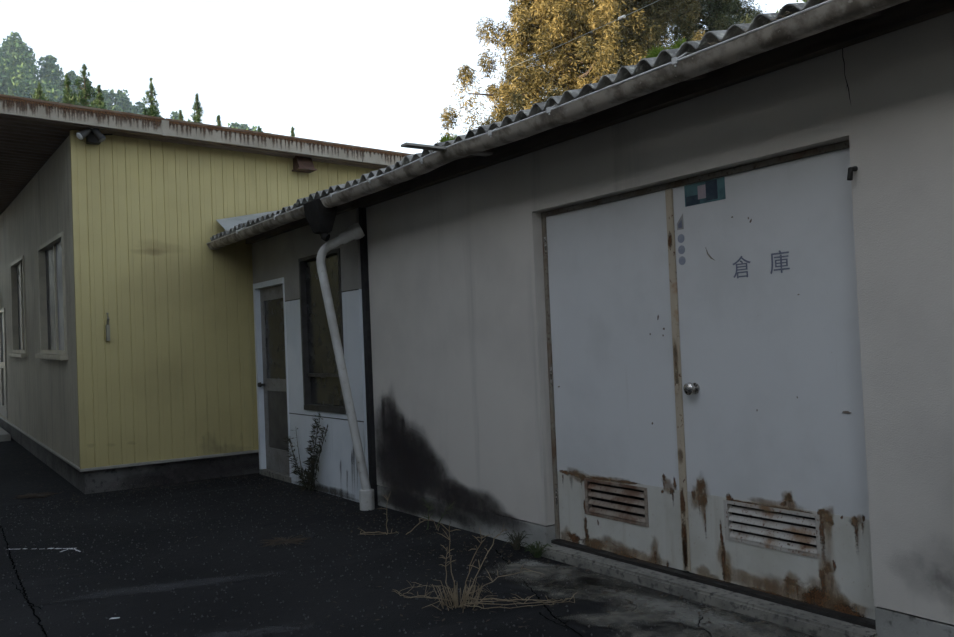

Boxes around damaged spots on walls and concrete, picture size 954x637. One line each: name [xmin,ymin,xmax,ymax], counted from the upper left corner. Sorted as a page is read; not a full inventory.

corrosion [0,96,407,162]
damp [376,401,517,527]
corrosion [561,501,673,569]
corrosion [661,473,708,567]
corrosion [698,493,865,618]